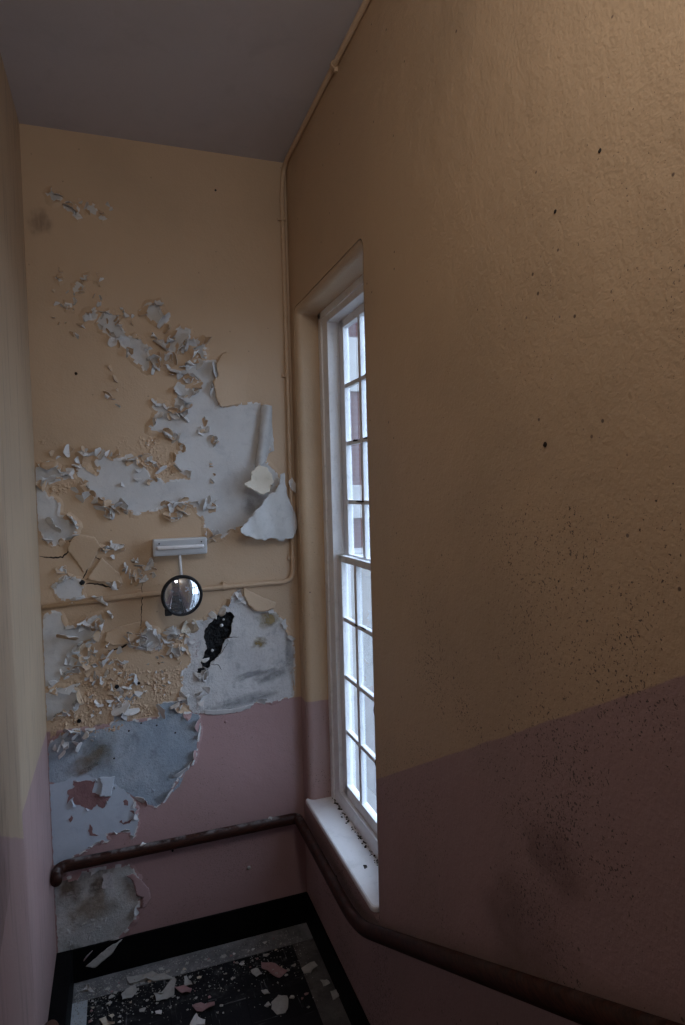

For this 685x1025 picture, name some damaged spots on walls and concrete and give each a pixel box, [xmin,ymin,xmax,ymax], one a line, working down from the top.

peeling [35,267,298,548]
peeling [42,540,298,968]